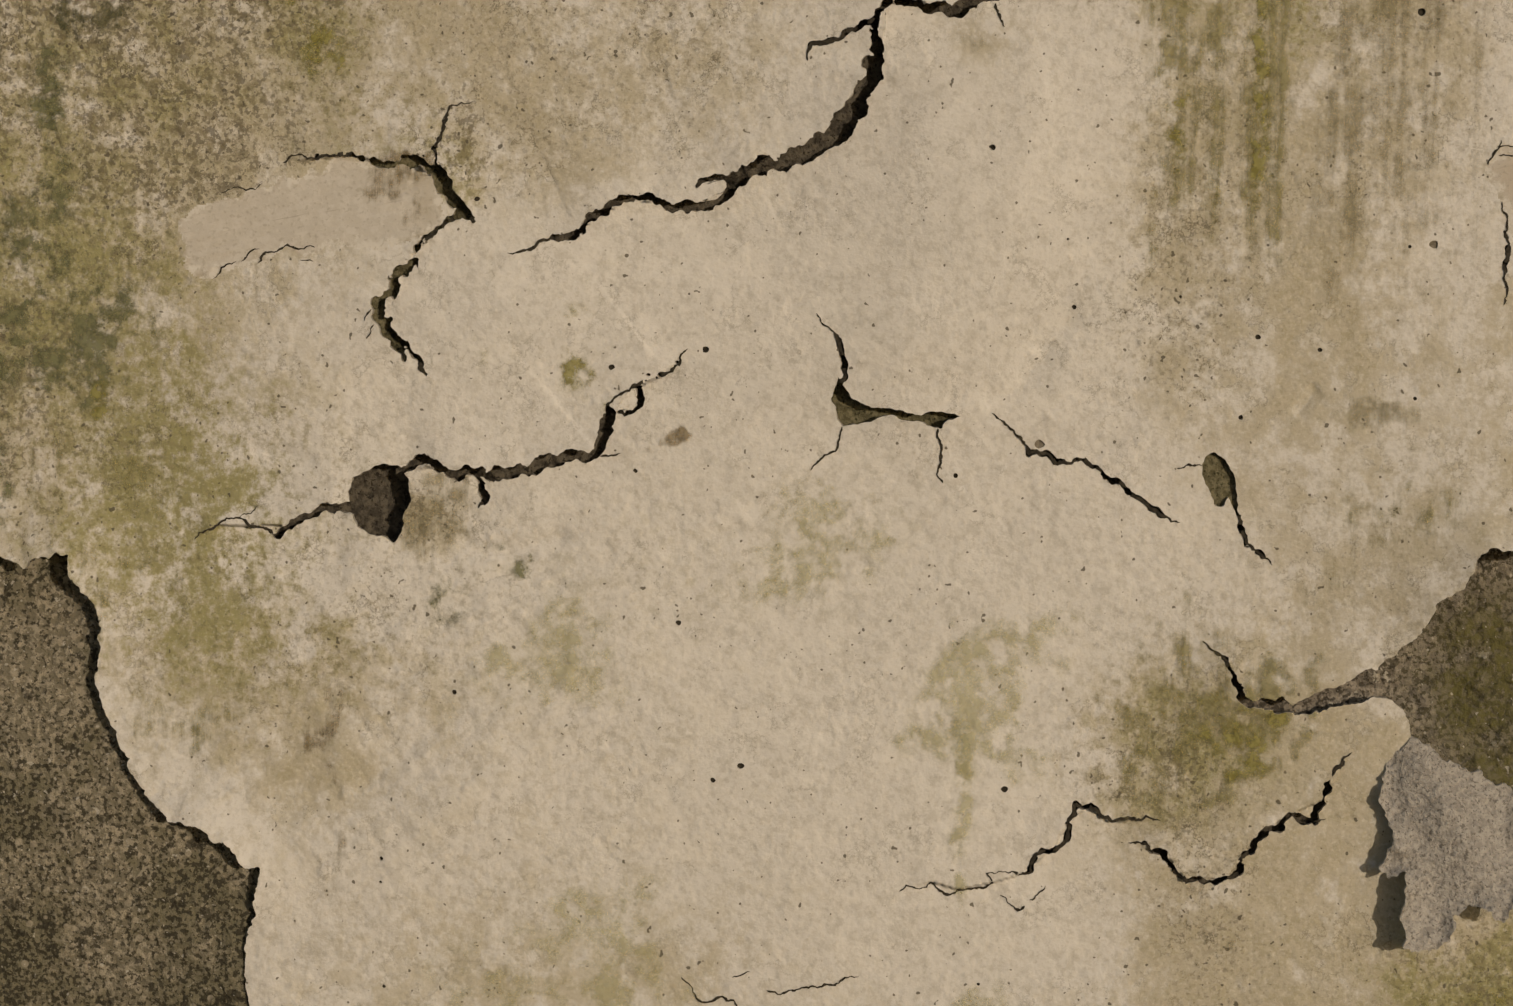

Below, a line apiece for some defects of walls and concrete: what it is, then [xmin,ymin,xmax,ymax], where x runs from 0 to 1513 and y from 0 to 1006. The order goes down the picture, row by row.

crack [213,101,476,376]
crack [509,0,1004,255]
damp [1151,0,1225,76]
damp [1164,89,1224,207]
damp [1241,0,1291,240]
crack [1487,140,1513,165]
crack [1501,203,1511,305]
crack [195,349,687,539]
crack [992,413,1180,523]
peeling [1177,357,1513,953]
spalling [0,552,260,1006]
crack [899,753,1351,912]